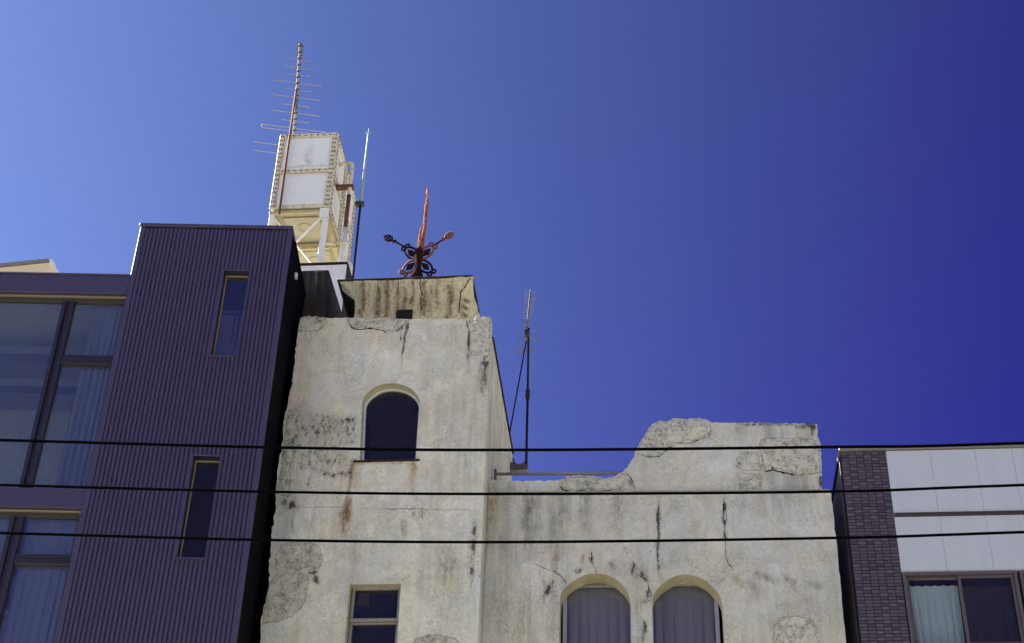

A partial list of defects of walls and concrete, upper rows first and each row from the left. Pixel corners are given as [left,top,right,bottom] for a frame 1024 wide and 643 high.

rust [359,278,470,319]
water stain [296,416,356,478]
spalling [559,473,635,491]
spalling [636,418,711,458]
spalling [736,450,763,489]
spalling [263,542,323,623]
crack [637,505,660,603]
crack [714,501,734,588]